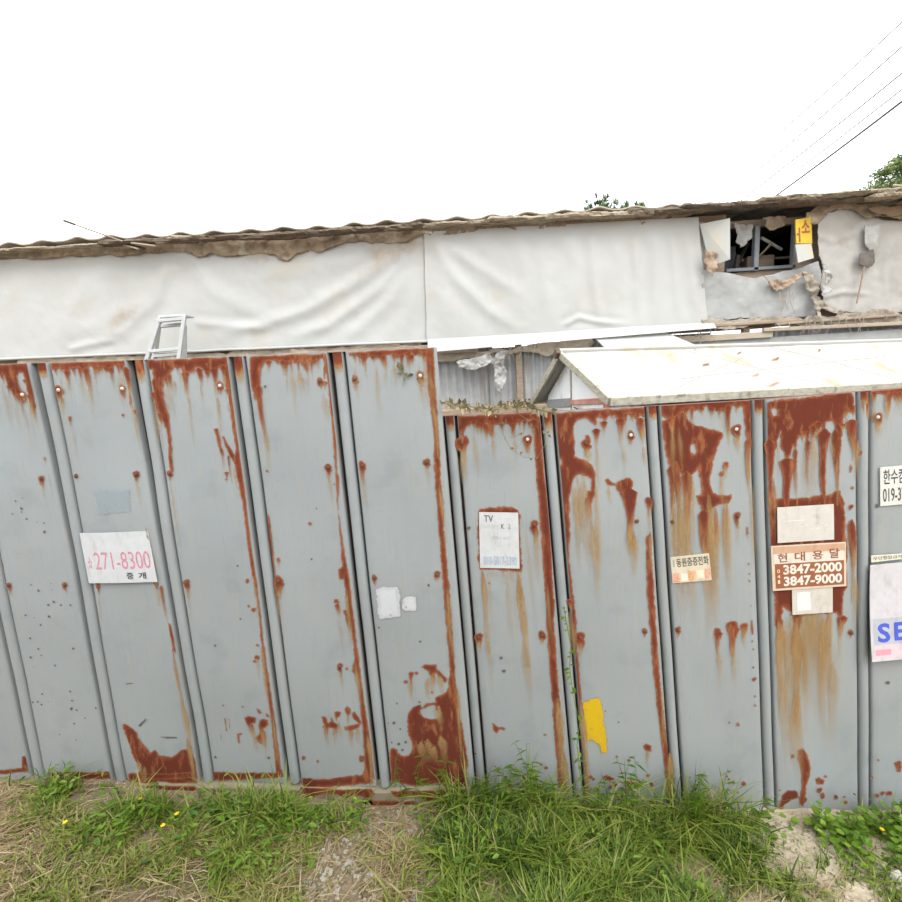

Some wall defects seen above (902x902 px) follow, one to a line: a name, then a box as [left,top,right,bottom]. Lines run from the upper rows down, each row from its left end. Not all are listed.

rust [0,348,902,810]